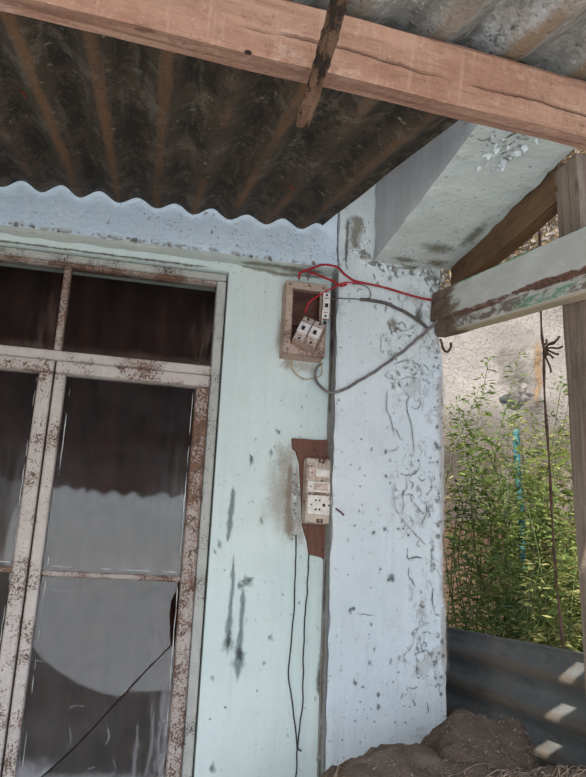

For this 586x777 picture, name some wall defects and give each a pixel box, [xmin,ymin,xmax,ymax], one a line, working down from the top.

peeling [477,133,539,172]
water stain [215,489,235,553]
peeling [392,470,442,552]
water stain [224,563,252,677]